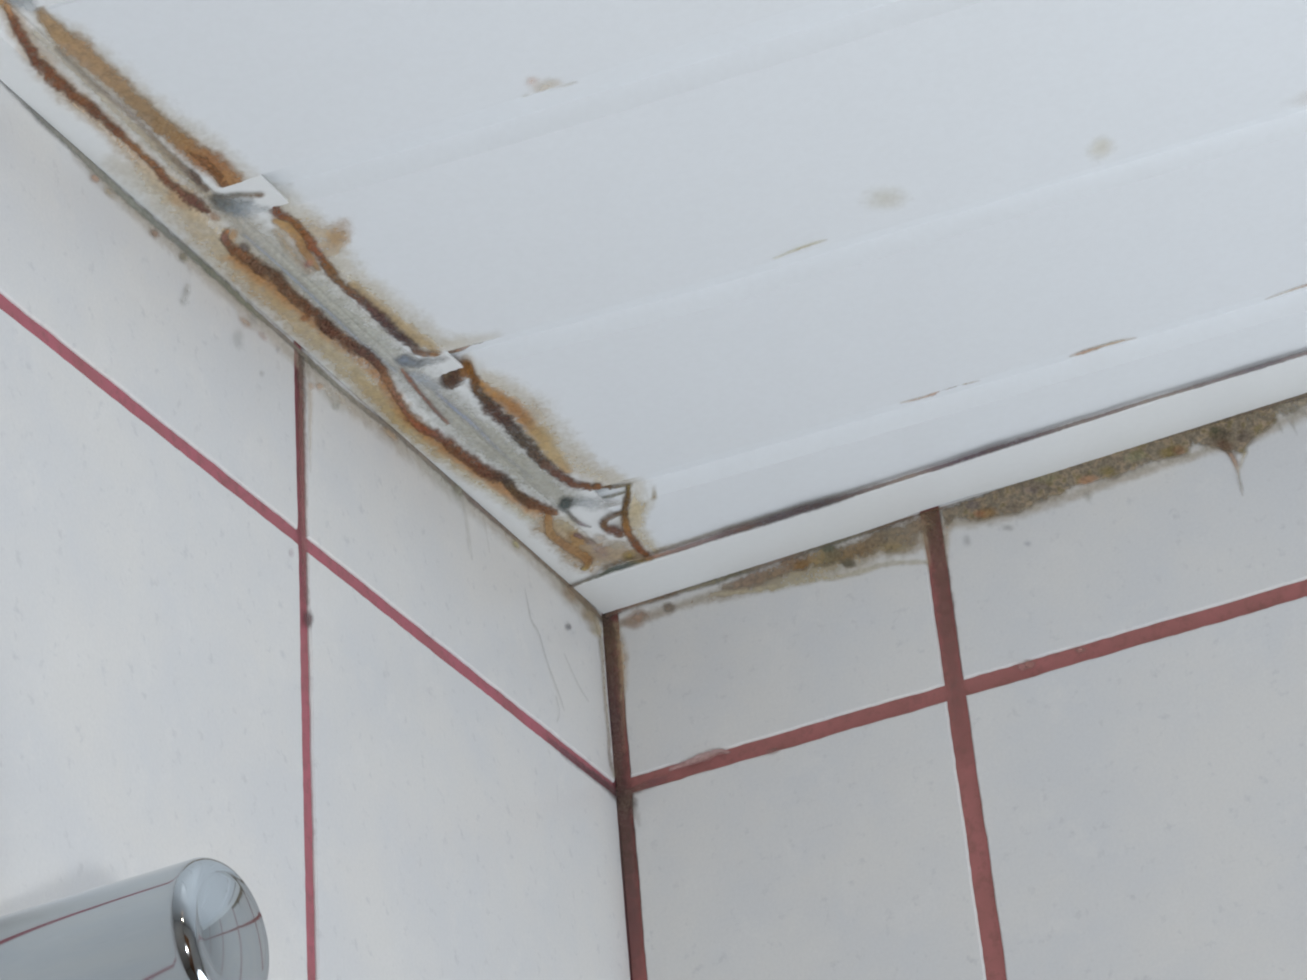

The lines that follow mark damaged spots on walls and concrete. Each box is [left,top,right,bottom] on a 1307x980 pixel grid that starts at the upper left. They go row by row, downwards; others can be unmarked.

corrosion [0,0,655,588]
damp [5,84,1307,625]